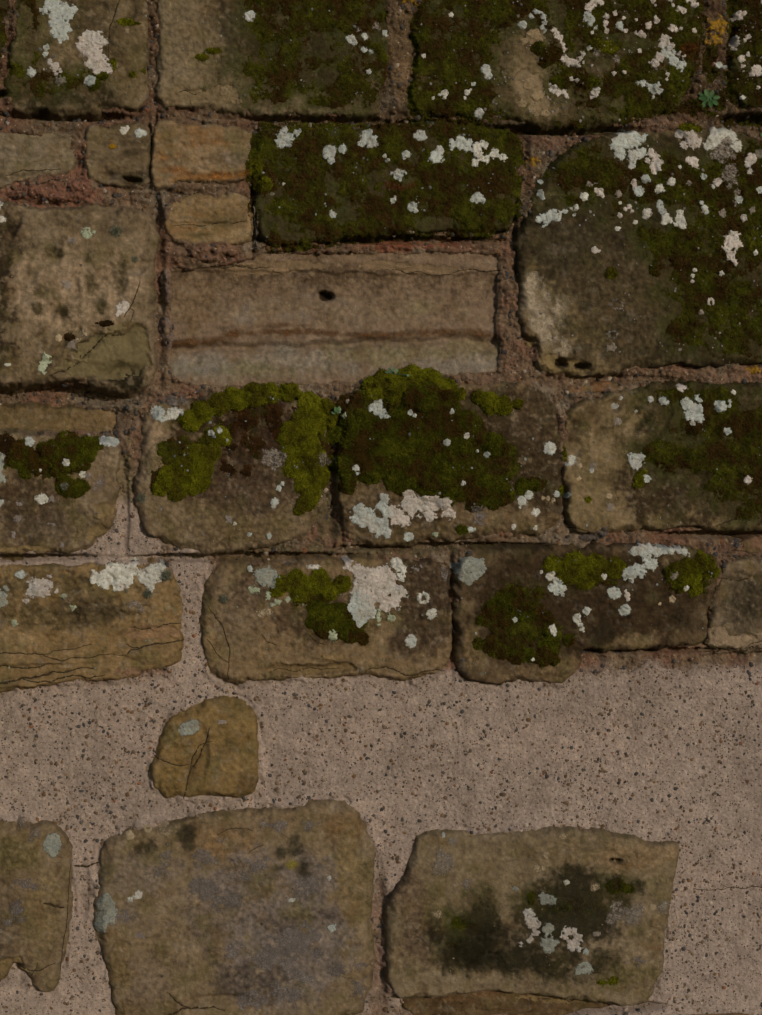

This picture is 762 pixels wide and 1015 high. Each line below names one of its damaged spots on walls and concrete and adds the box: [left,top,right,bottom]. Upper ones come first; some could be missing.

crack [155,728,212,799]
crack [167,992,225,1015]